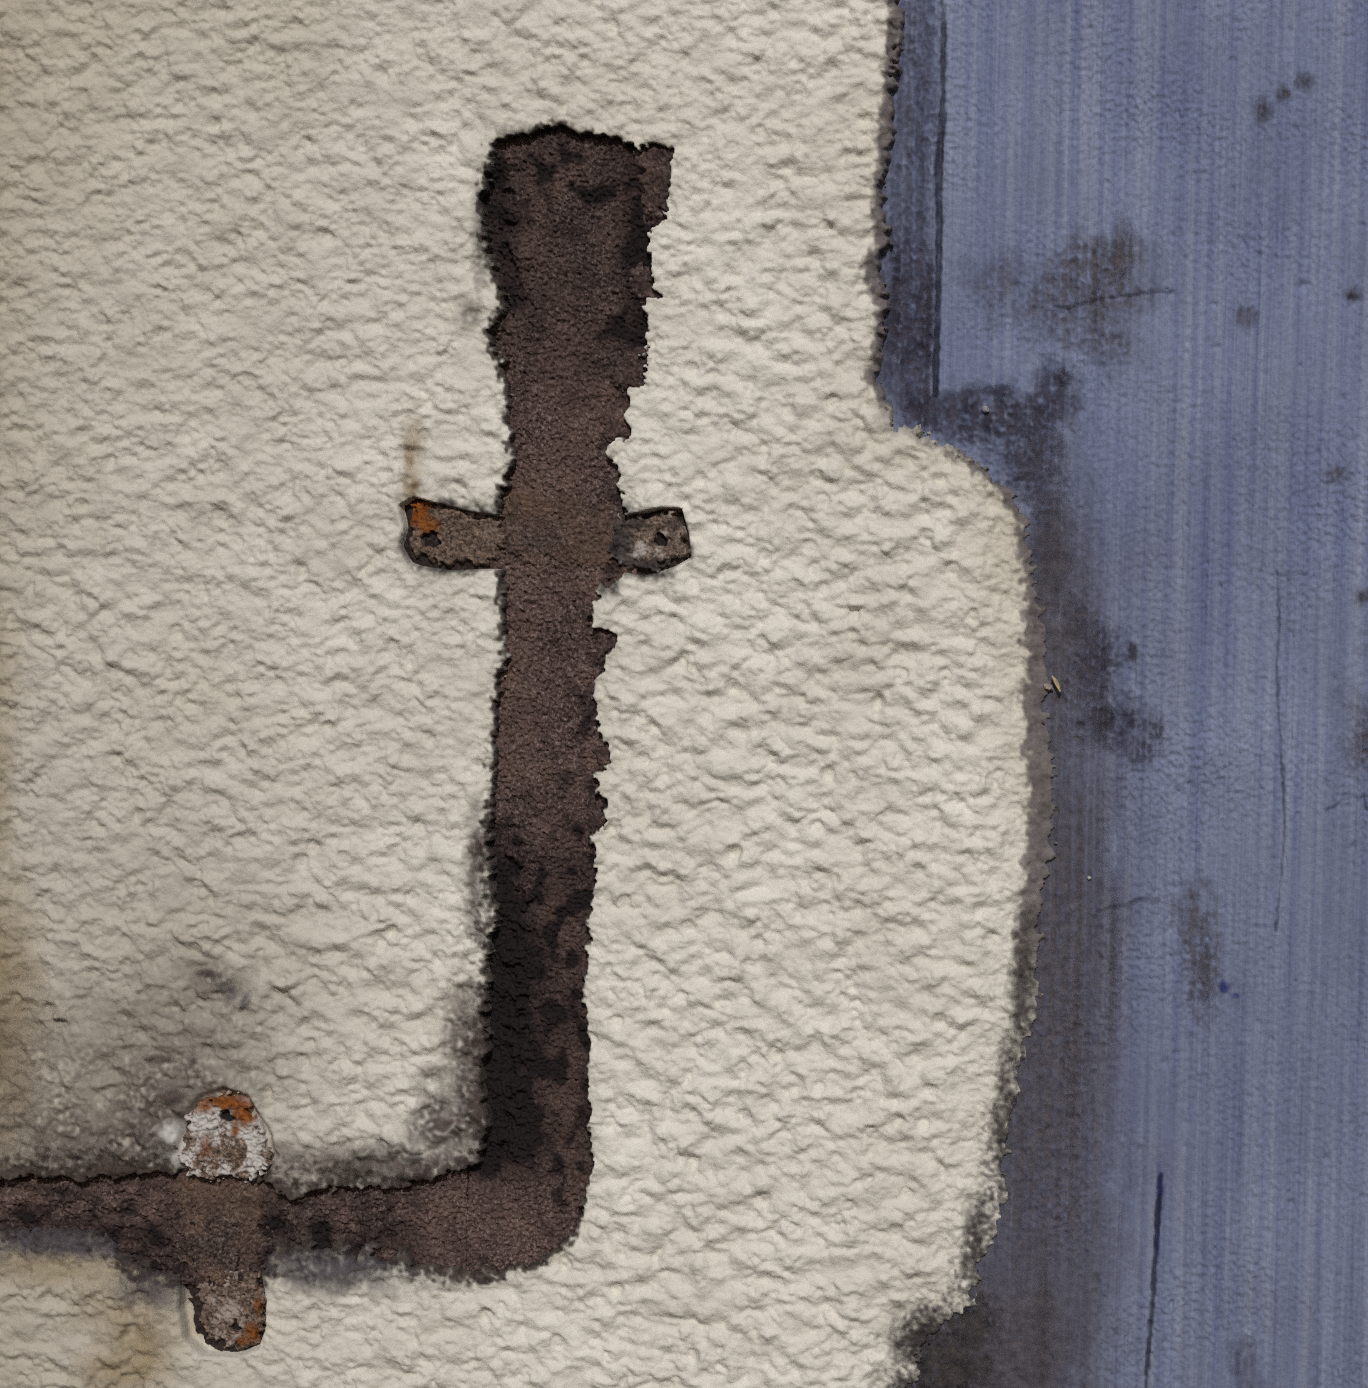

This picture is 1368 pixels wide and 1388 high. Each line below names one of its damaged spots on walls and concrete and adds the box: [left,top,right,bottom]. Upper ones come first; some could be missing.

peeling [864,0,905,405]
rust [406,480,436,532]
peeling [917,449,1061,1324]
rust [198,1093,257,1137]